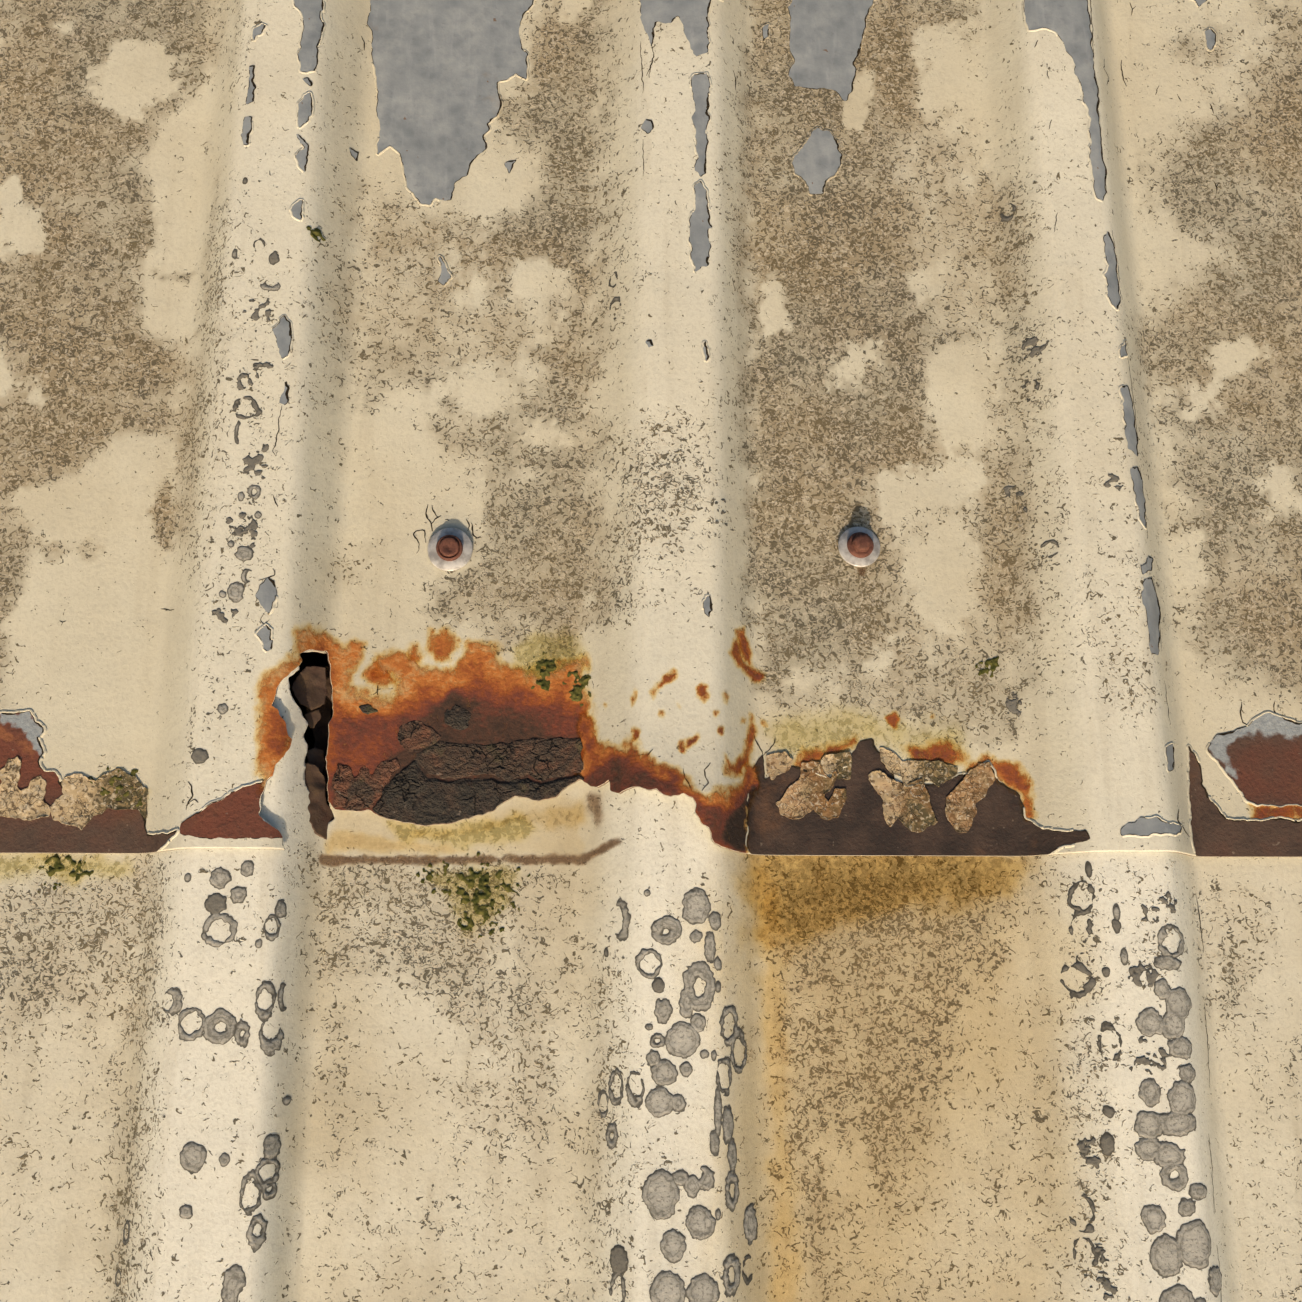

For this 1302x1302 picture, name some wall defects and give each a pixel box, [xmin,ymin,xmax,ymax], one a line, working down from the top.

peeling [367,0,536,206]
peeling [638,0,724,273]
peeling [790,126,844,196]
peeling [786,0,876,101]
peeling [1022,0,1107,202]
peeling [1103,232,1122,311]
peeling [1118,339,1128,359]
peeling [1118,384,1147,530]
peeling [1141,556,1161,655]
corrosion [0,629,1090,856]
corrosion [1186,710,1302,857]